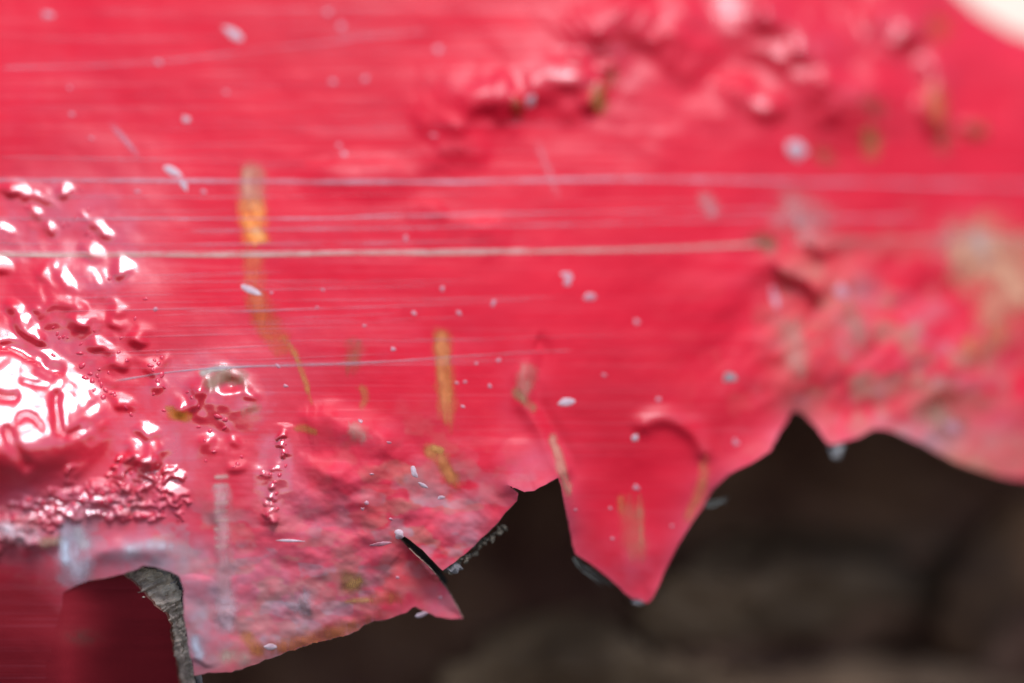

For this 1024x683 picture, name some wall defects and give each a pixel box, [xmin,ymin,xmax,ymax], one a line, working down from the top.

rust [241,167,298,363]
rust [435,331,453,420]
peeling [370,529,404,546]
spalling [443,524,507,575]
spalling [124,566,203,683]